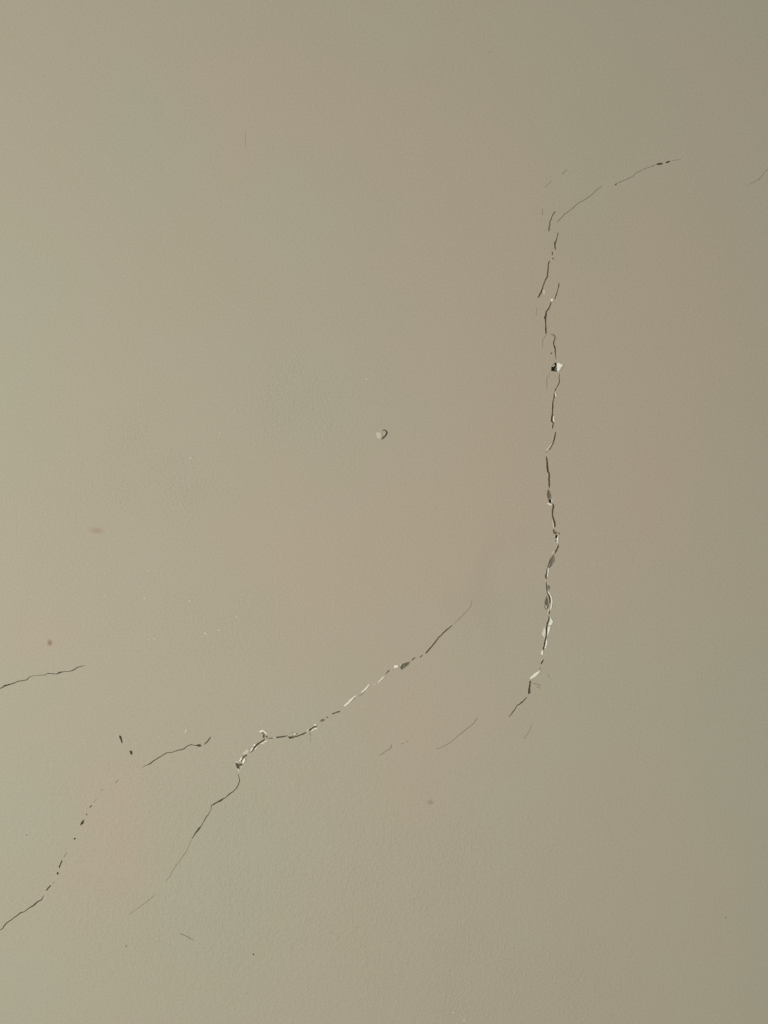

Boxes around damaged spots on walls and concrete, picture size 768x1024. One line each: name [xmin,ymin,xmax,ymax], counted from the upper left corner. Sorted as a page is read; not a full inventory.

crack [509,159,681,738]
crack [0,665,85,689]
crack [0,779,119,931]
crack [128,601,472,915]